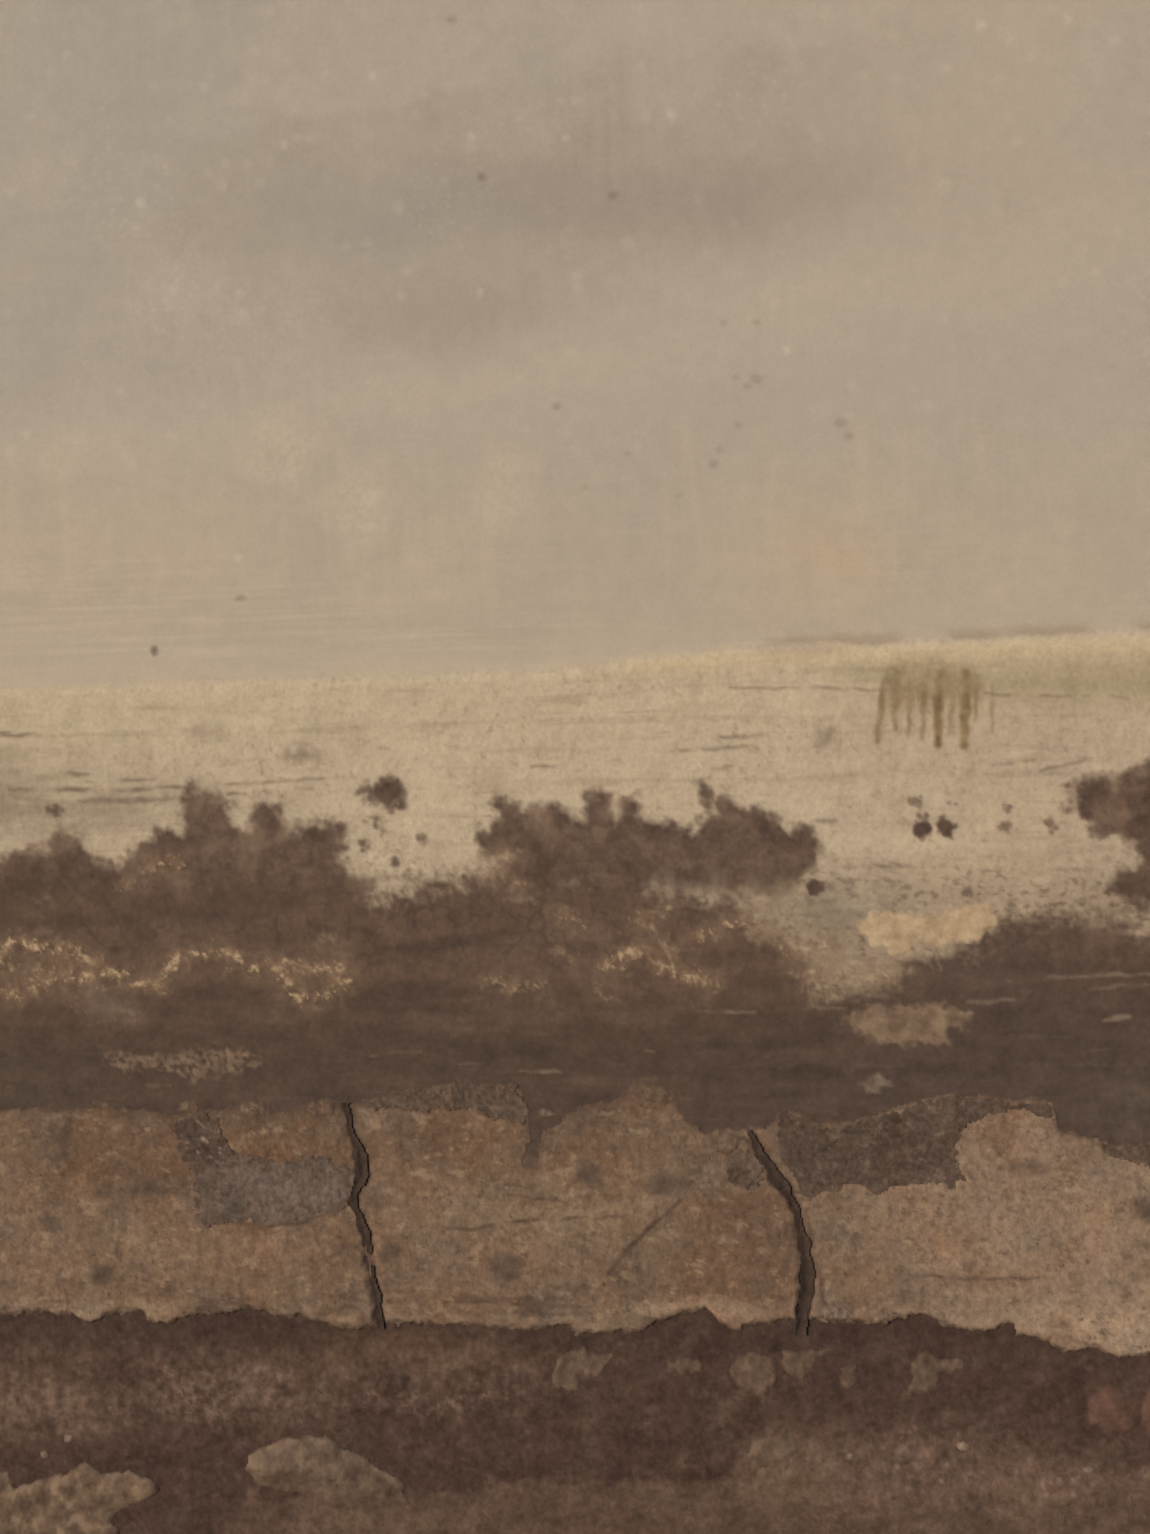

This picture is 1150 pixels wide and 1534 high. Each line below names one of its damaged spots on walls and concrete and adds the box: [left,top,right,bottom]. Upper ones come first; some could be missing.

corrosion [871,695,999,752]
peeling [838,995,977,1055]
spalling [172,1111,356,1229]
crack [232,1102,384,1329]
crack [740,1130,830,1336]
spalling [724,1068,1056,1202]